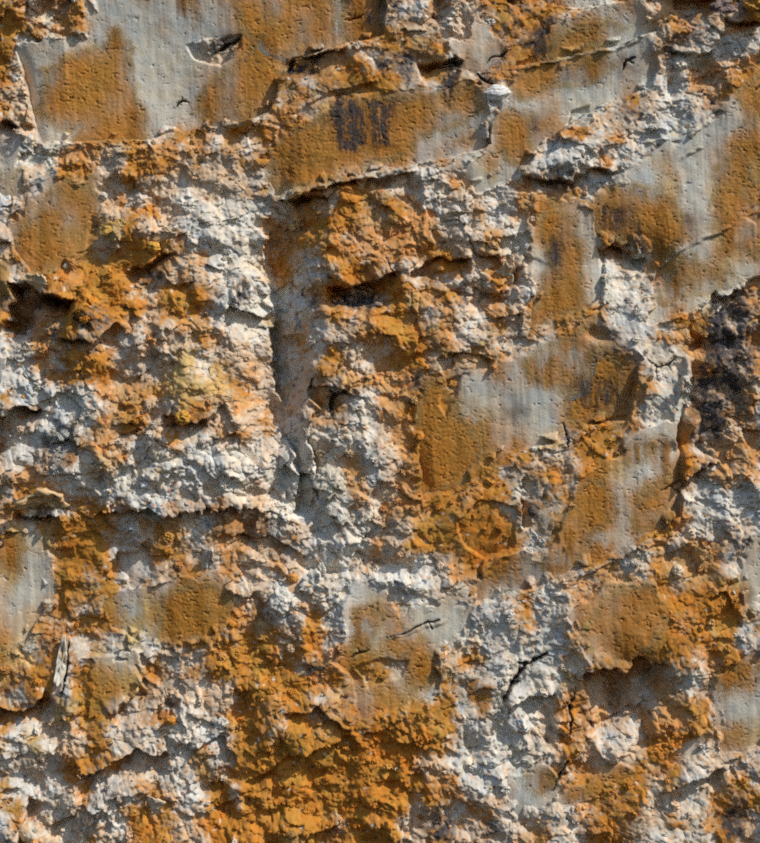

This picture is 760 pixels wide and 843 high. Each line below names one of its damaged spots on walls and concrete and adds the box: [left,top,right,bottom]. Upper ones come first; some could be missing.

rust [34,27,147,143]
rust [198,0,382,125]
rust [270,87,486,190]
rust [13,181,97,273]
spalling [277,161,531,372]
water stain [691,299,747,438]
crack [384,617,441,637]
spalling [0,634,68,725]
crack [500,649,549,704]
crack [566,689,576,737]
spalling [570,656,676,753]
spalling [584,788,637,843]